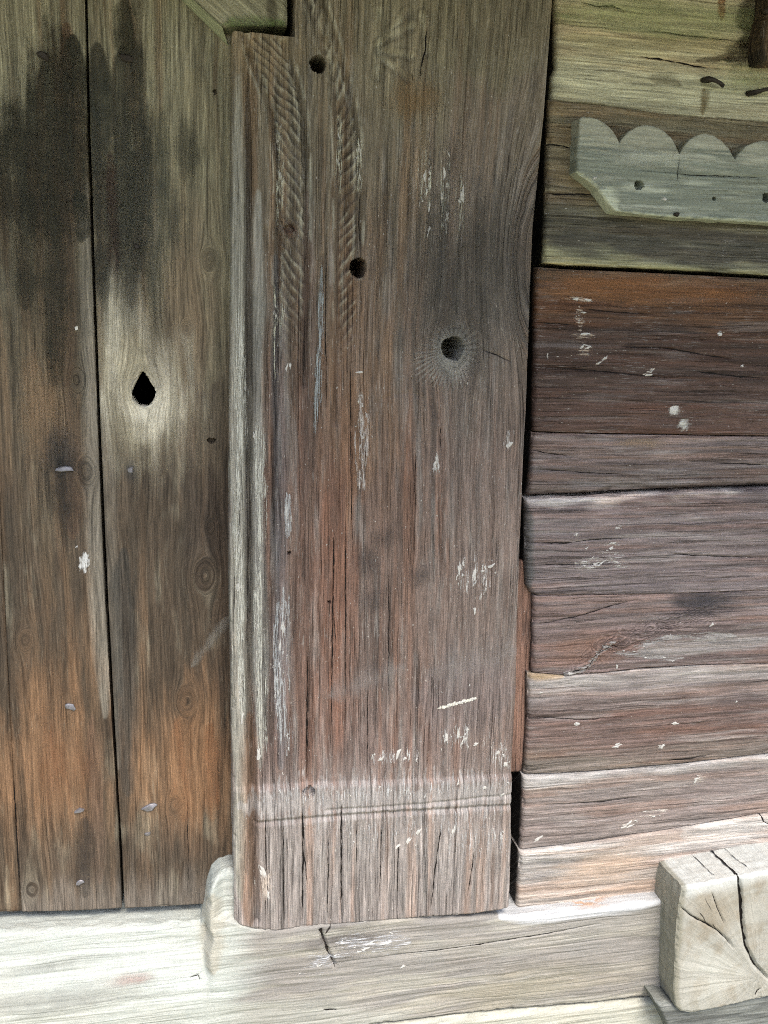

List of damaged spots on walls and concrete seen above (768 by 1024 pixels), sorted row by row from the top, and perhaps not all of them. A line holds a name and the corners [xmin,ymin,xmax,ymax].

damp [0,0,167,333]
crack [265,787,399,966]
crack [681,850,761,995]